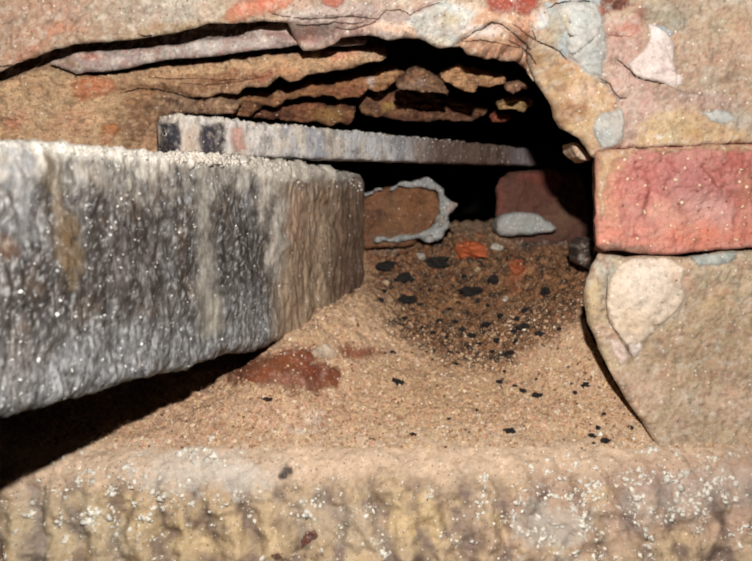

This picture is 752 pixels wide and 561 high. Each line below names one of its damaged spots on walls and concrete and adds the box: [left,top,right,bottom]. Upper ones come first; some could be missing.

crack [548,0,590,8]
crack [0,2,440,101]
crack [457,21,567,64]